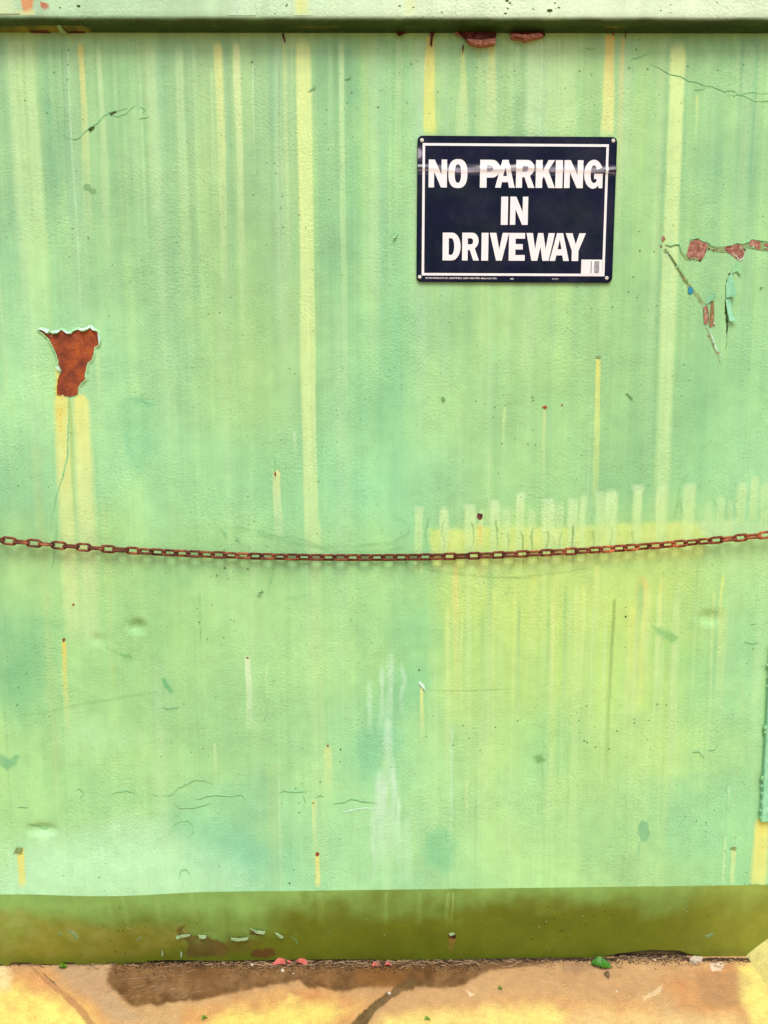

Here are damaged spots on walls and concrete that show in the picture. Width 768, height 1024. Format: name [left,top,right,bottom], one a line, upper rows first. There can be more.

corrosion [510,32,545,43]
crack [633,54,768,102]
crack [68,105,149,140]
peeling [660,236,768,362]
peeling [36,325,103,398]
crack [49,399,71,571]
leakage [411,475,768,887]
crack [111,779,245,809]
crack [277,790,374,805]